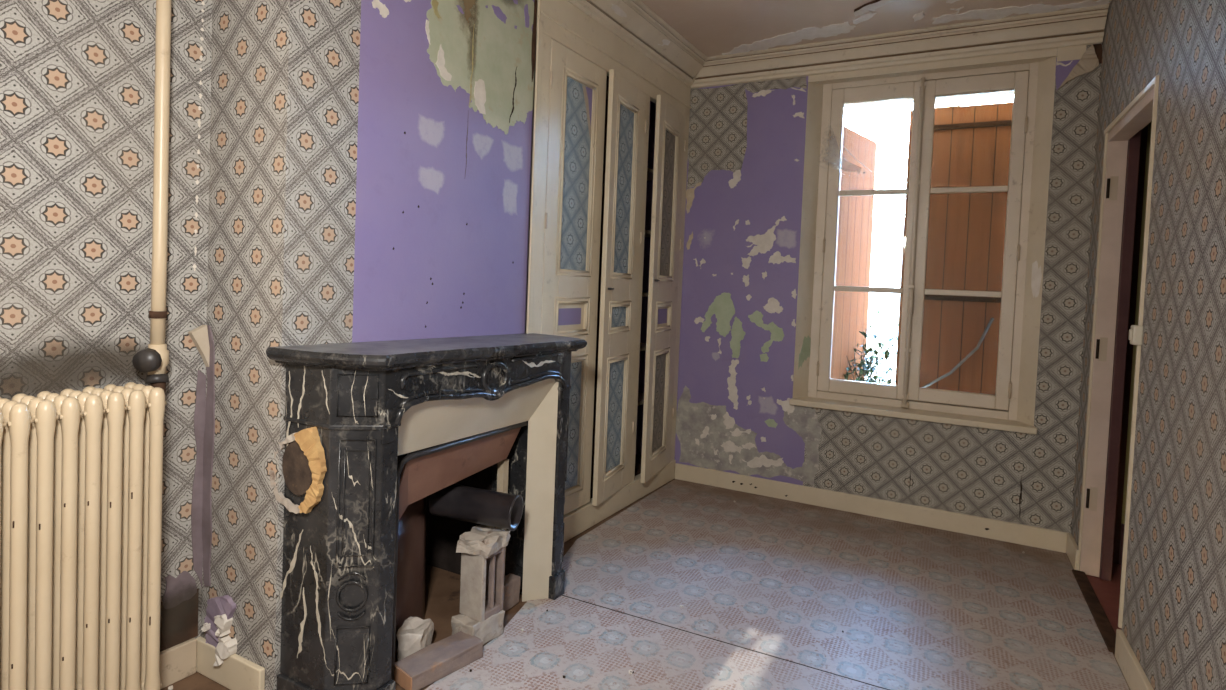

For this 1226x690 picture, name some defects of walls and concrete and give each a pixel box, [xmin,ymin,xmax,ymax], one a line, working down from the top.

water stain [462,0,476,106]
peeling [425,0,534,135]
peeling [686,232,796,301]
peeling [695,388,795,464]